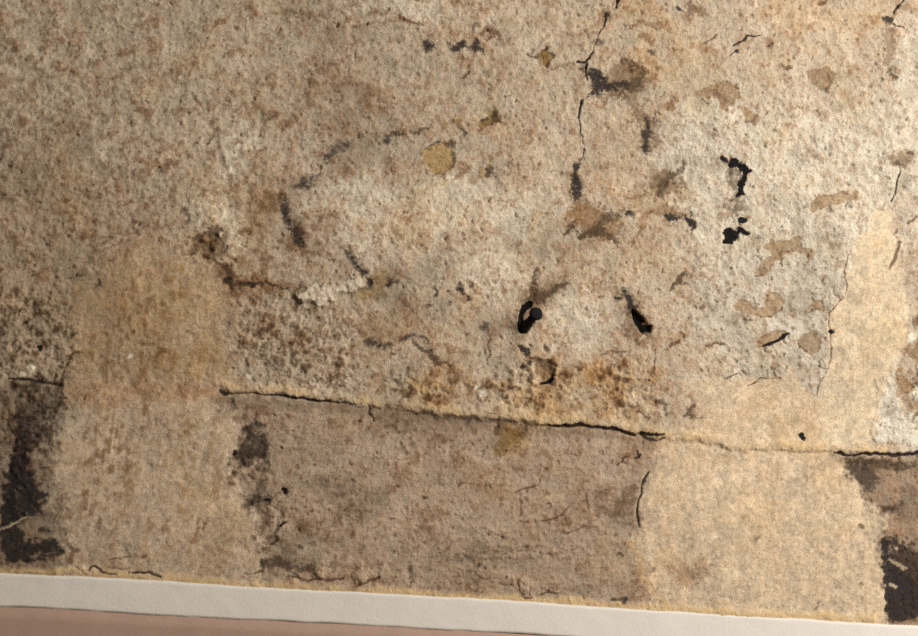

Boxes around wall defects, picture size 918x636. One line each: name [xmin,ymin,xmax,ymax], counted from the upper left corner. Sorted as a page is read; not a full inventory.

crack [576,0,619,158]
peeling [720,155,752,198]
peeling [723,217,751,244]
hole [615,287,654,346]
crack [219,390,374,421]
crack [834,450,918,471]
damp [844,461,904,516]